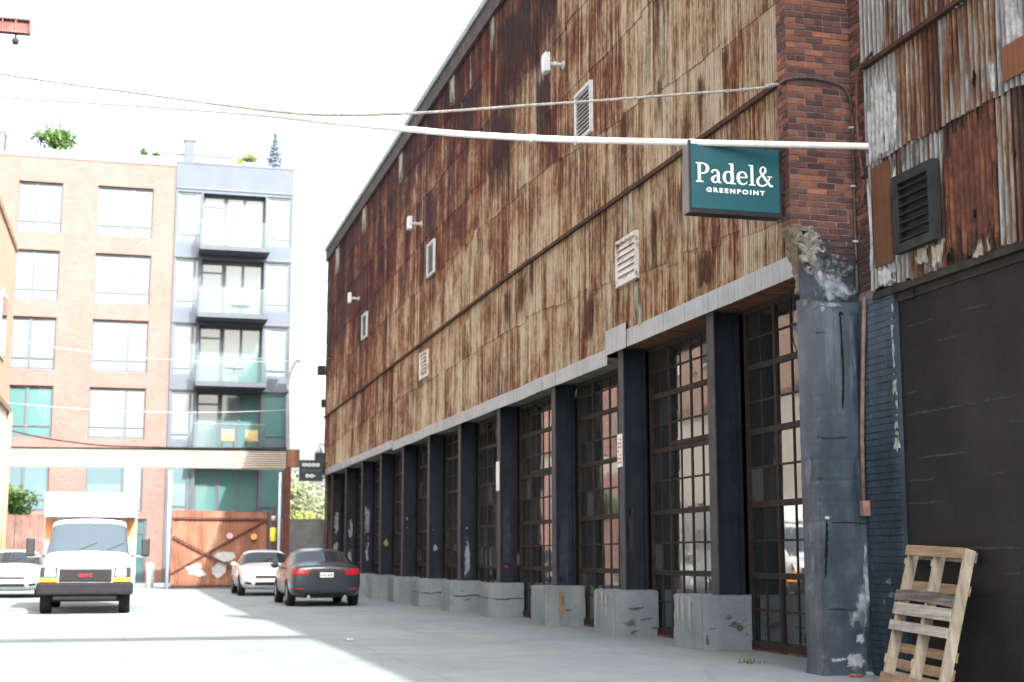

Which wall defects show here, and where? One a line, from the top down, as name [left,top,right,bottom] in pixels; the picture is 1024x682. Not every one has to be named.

rust [490,0,555,188]
rust [943,99,1000,254]
rust [505,264,532,325]
rust [585,294,593,339]
rust [697,252,711,288]
spalling [782,223,855,312]
peeling [915,239,944,267]
peeling [973,239,990,258]
crack [817,311,844,409]
peeling [891,304,900,451]
crack [825,516,866,578]
peeling [832,634,870,668]